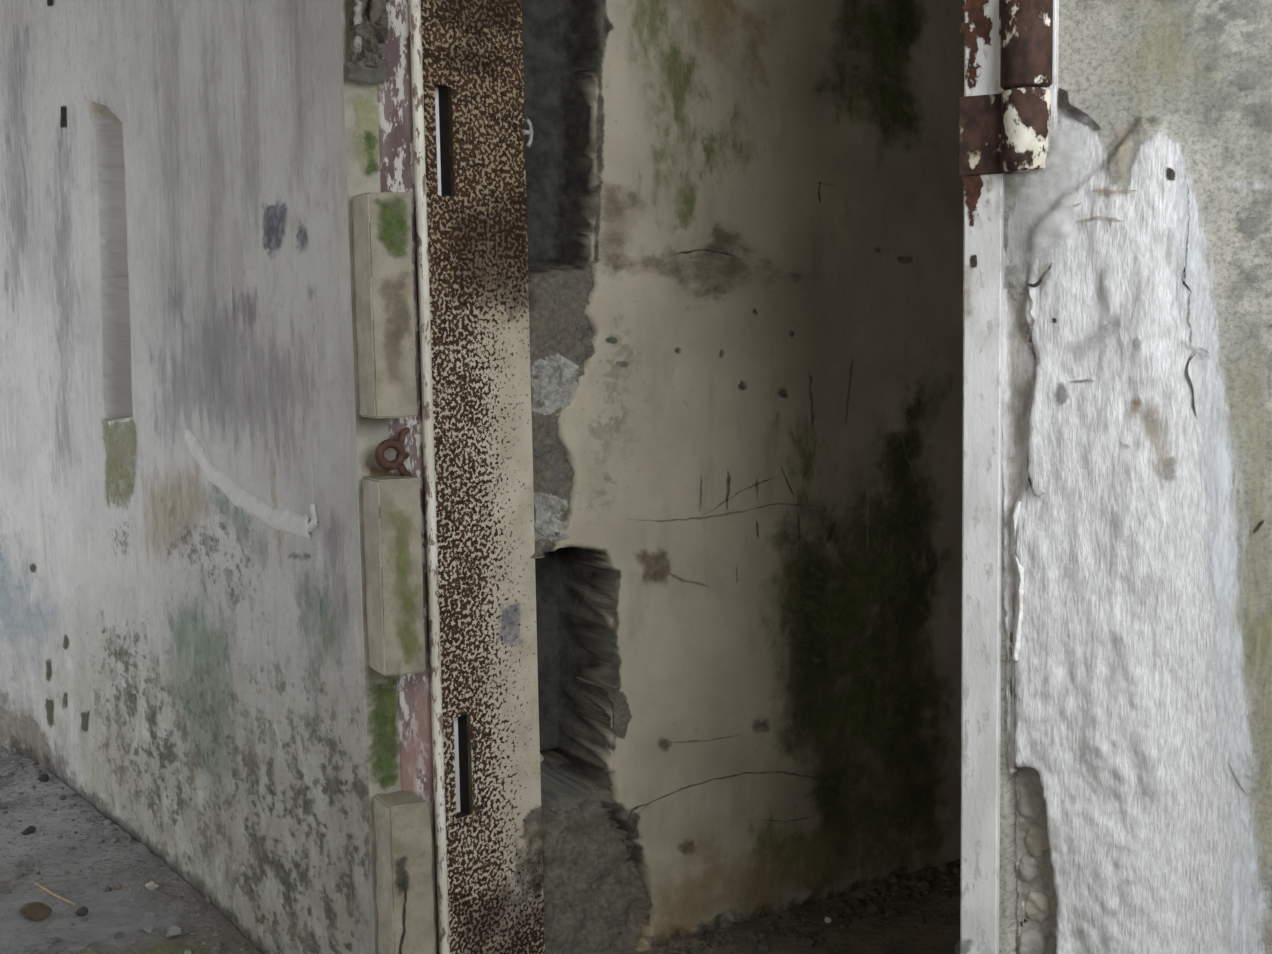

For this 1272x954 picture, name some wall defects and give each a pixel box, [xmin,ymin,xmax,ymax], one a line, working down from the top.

corrosion [960,0,992,89]
spalling [528,0,613,558]
corrosion [962,175,983,226]
crack [1183,174,1210,419]
damp [0,691,67,770]
damp [81,711,89,732]
damp [95,678,367,934]
spalling [540,747,652,954]
spalling [574,568,632,751]